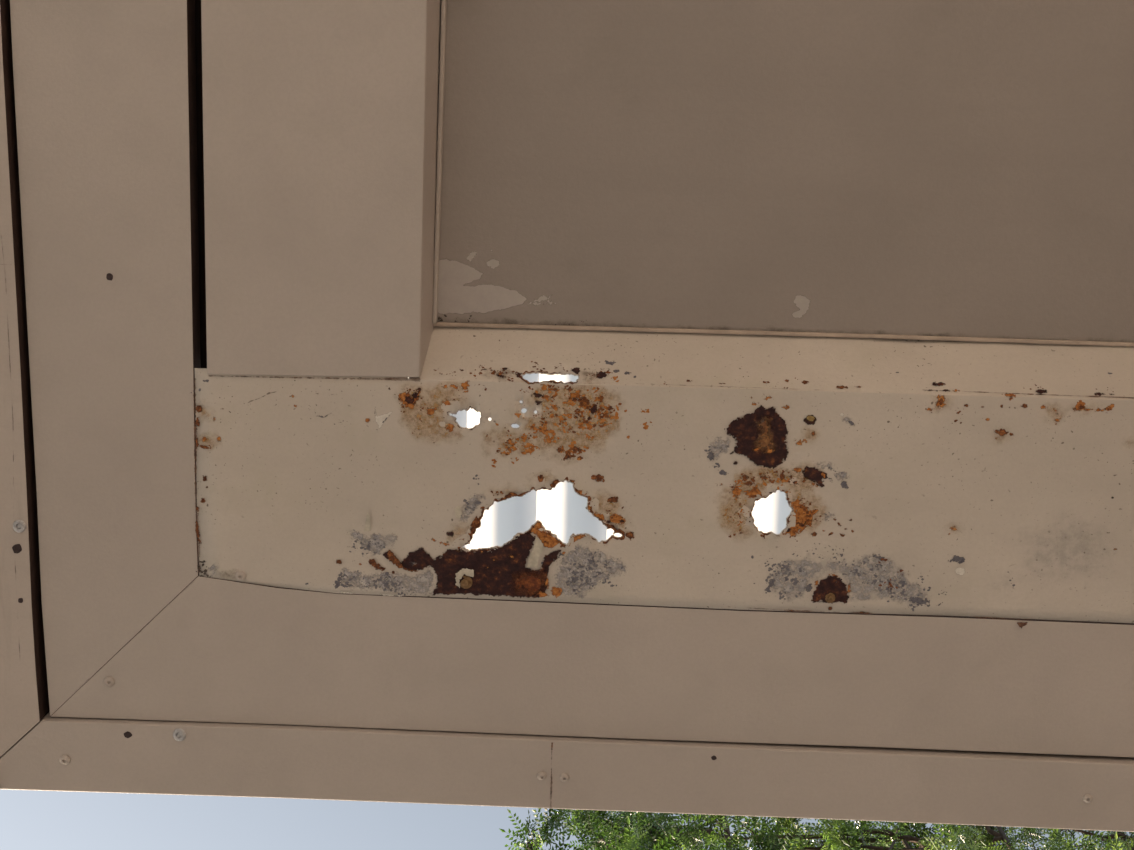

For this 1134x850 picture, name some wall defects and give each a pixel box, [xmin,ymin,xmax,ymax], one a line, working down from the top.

peeling [438,249,556,314]
corrosion [388,360,636,467]
corrosion [925,382,968,424]
corrosion [1030,385,1114,425]
corrosion [721,377,854,542]
corrosion [579,490,634,541]
corrosion [359,491,584,598]
peeling [551,546,625,598]
corrosion [788,574,870,614]
peeling [751,543,947,611]
peeling [948,555,965,575]